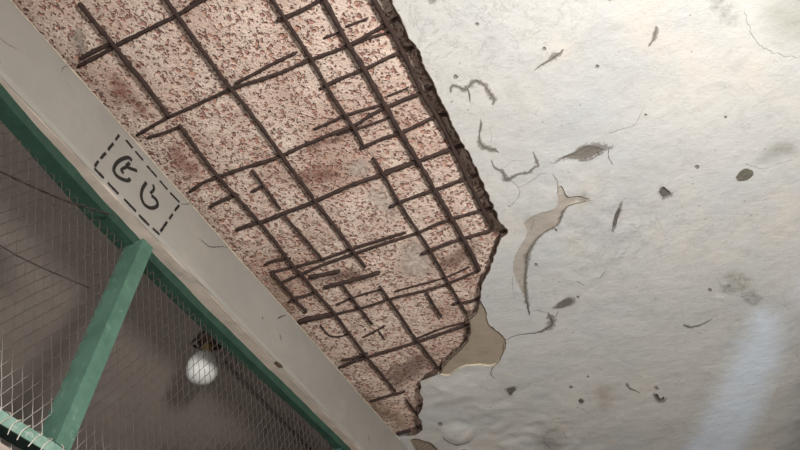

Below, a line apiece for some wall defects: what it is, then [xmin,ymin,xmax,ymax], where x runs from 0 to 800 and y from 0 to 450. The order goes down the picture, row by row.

spalling [11,0,508,450]
peeling [513,186,590,295]
spalling [555,296,580,308]